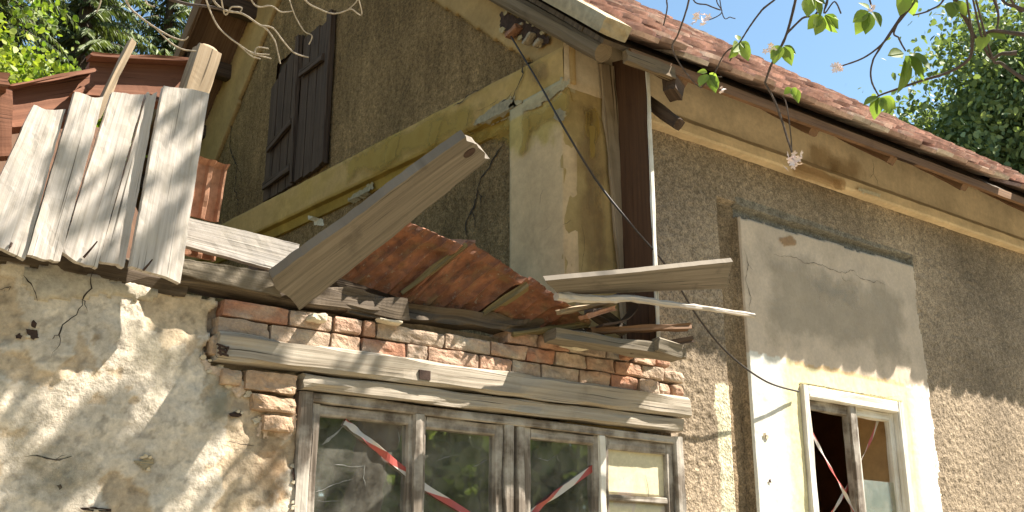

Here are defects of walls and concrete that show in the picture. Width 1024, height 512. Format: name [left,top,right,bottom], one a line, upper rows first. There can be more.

spalling [499,11,550,48]
spalling [473,96,522,126]
crack [465,144,503,235]
spalling [15,320,39,340]
crack [52,272,93,353]
spalling [200,355,297,440]
spalling [134,454,154,471]
spalling [290,463,298,510]